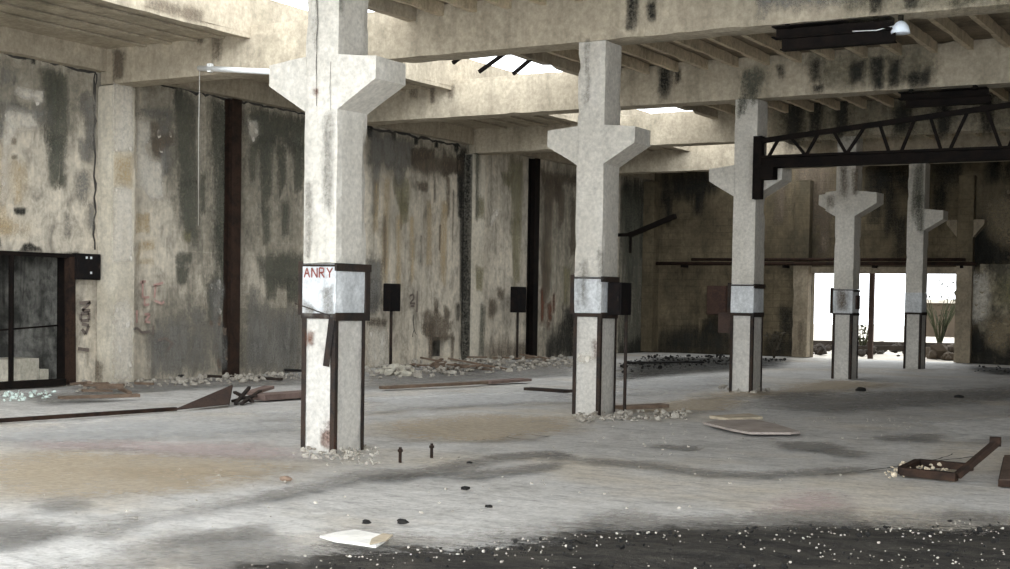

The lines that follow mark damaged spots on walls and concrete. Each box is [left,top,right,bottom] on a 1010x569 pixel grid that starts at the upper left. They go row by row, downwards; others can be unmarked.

damp [626,0,656,29]
damp [738,68,764,114]
damp [810,52,931,91]
damp [0,57,68,188]
damp [778,92,1010,146]
crack [6,54,98,250]
damp [76,92,96,229]
damp [21,243,41,252]
damp [138,90,225,375]
damp [367,127,526,360]
damp [971,329,1010,365]